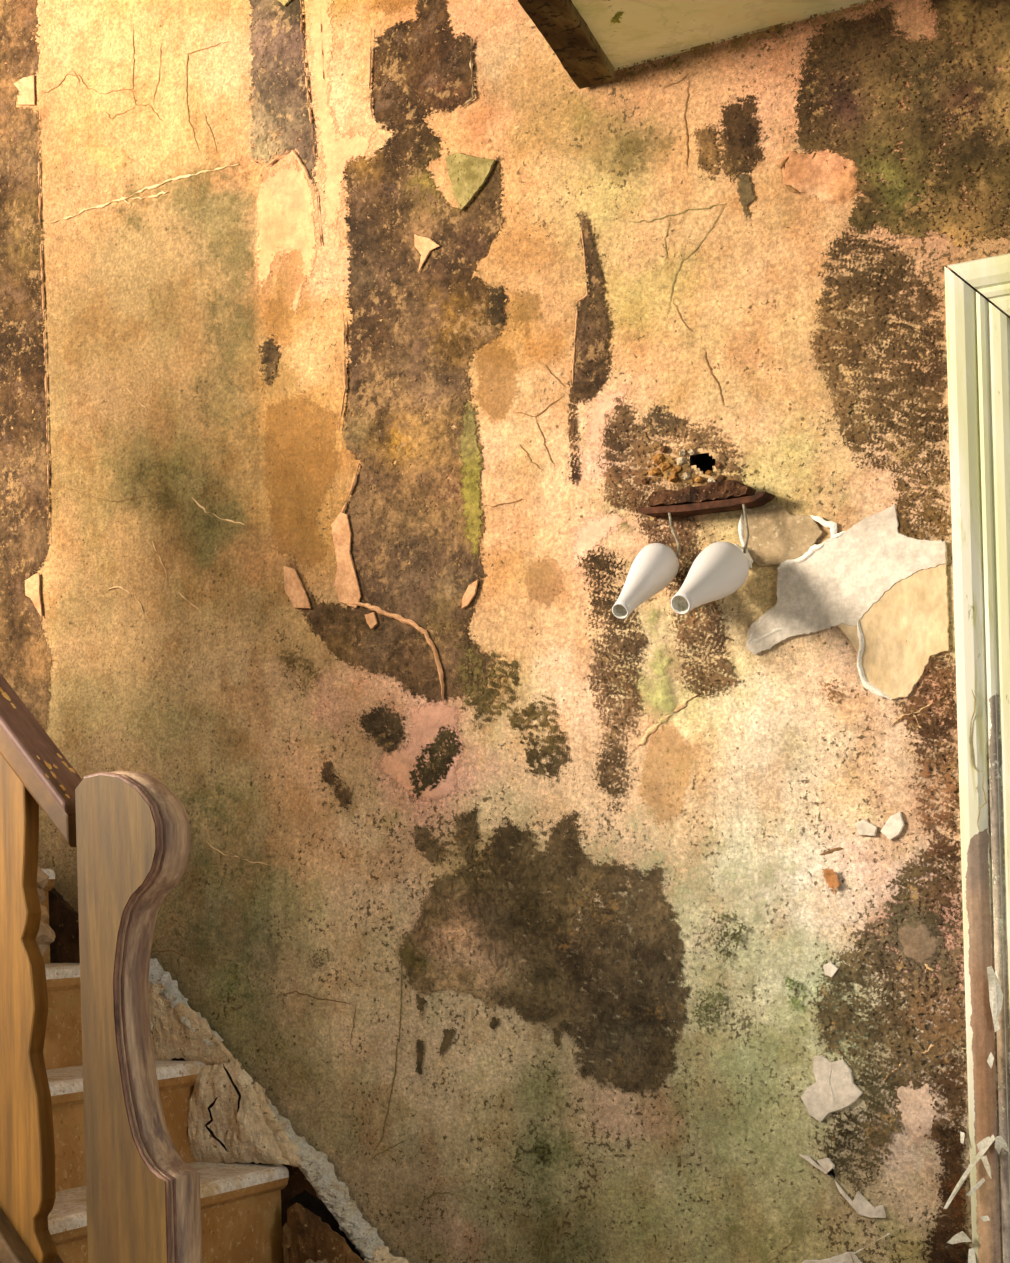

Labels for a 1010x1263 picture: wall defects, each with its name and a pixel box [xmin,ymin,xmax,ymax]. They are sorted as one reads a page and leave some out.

water stain [598,0,1010,540]
spalling [641,446,726,484]
mould [450,643,572,787]
peeling [571,502,737,811]
spalling [735,502,950,700]
spalling [149,958,224,1048]
water stain [394,803,733,1094]
mould [708,908,747,966]
mould [784,645,972,1263]
spalling [801,1055,863,1122]
spalling [267,1098,409,1263]
spalling [799,1154,886,1218]